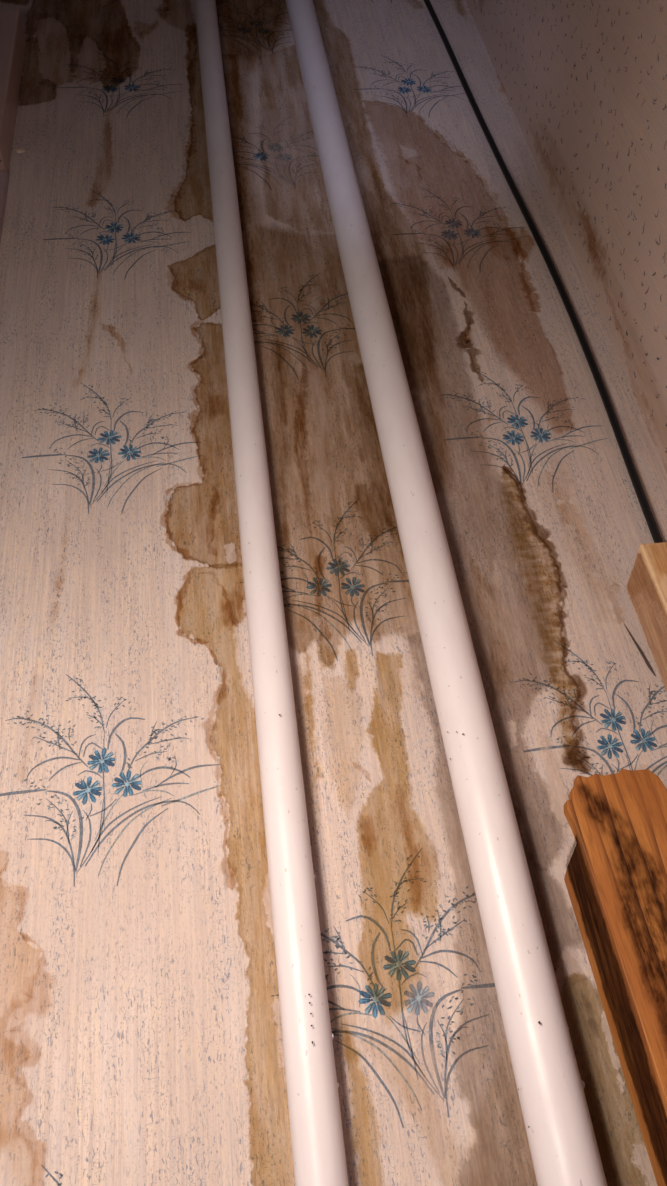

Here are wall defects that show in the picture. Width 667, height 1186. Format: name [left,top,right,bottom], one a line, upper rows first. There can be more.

water stain [224,542,237,564]
water stain [509,720,517,746]
water stain [541,736,568,826]
water stain [263,874,274,939]
water stain [566,836,667,1186]